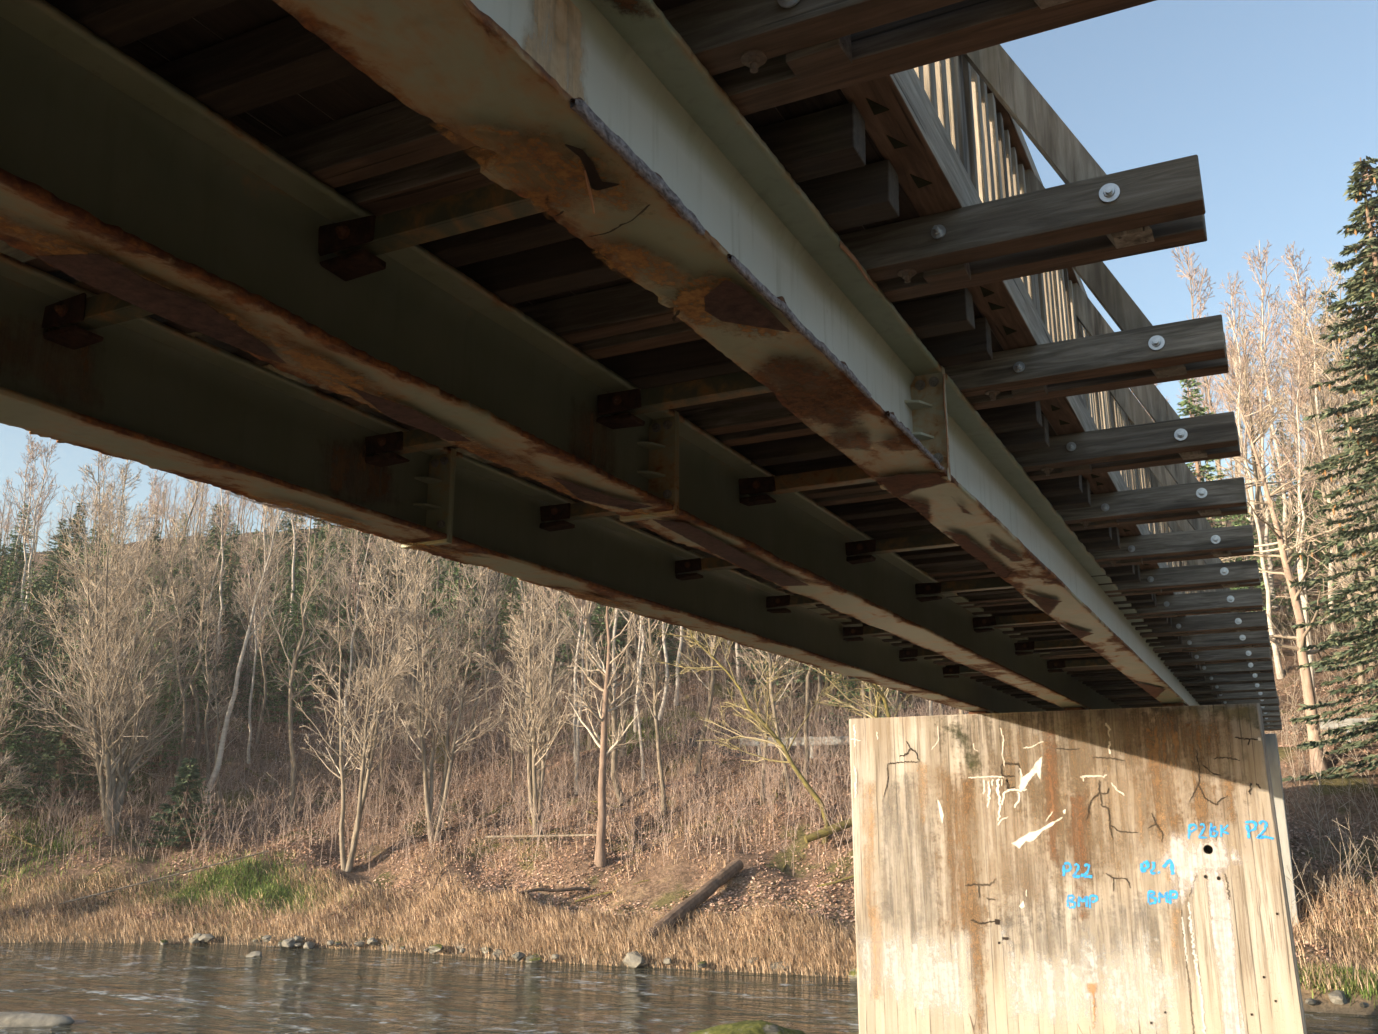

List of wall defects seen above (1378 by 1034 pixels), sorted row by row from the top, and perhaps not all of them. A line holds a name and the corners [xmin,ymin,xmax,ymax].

corrosion [215,309,432,420]
corrosion [704,254,947,518]
corrosion [232,494,480,557]
corrosion [543,585,636,610]
crack [1056,748,1164,842]
crack [1190,737,1261,805]
damp [1009,837,1246,1034]